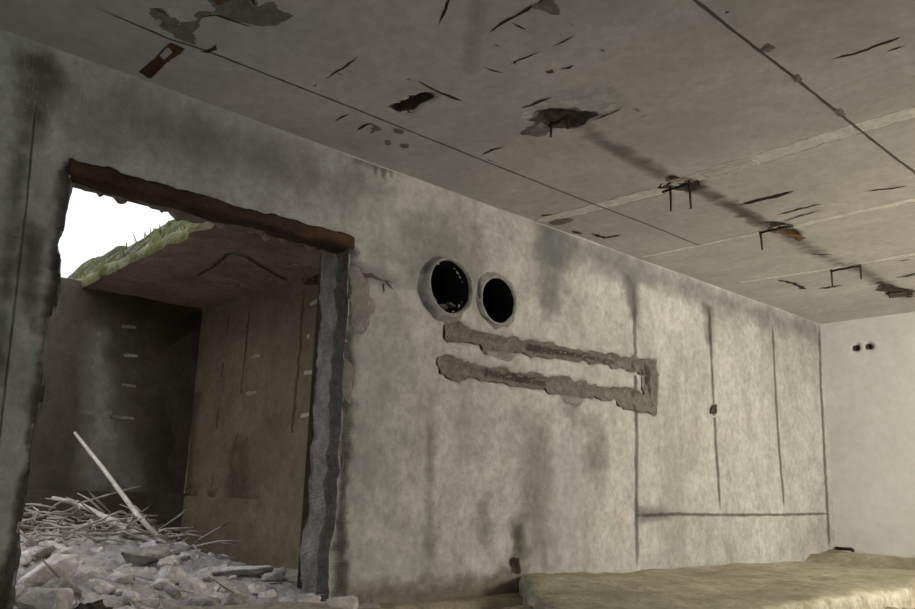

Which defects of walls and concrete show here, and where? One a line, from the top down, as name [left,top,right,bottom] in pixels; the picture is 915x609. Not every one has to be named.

peeling [149,0,293,44]
spalling [390,92,435,116]
spalling [520,90,621,137]
spalling [658,161,756,192]